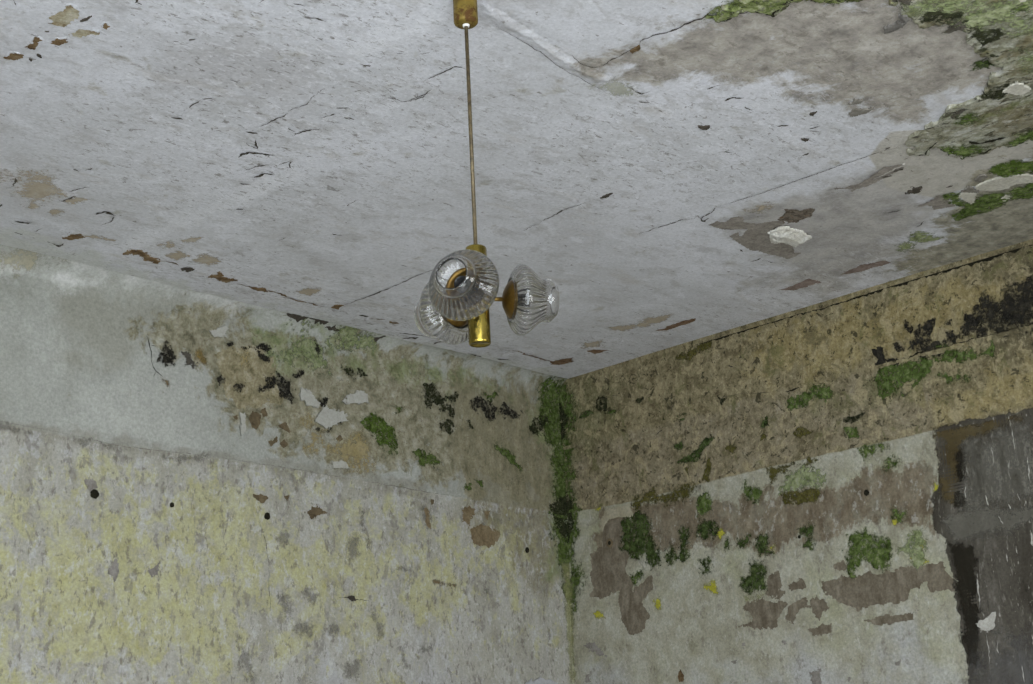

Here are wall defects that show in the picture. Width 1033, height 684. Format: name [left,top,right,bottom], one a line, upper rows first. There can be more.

spalling [3,3,112,61]
crack [499,12,710,93]
water stain [716,0,814,23]
water stain [888,0,1033,157]
peeling [905,174,1033,210]
flaking render [709,208,815,263]
peeling [287,313,339,332]
water stain [872,276,1033,369]
flaking render [209,325,287,436]
peeling [299,387,370,442]
peeling [589,503,653,635]
water stain [931,408,1033,684]